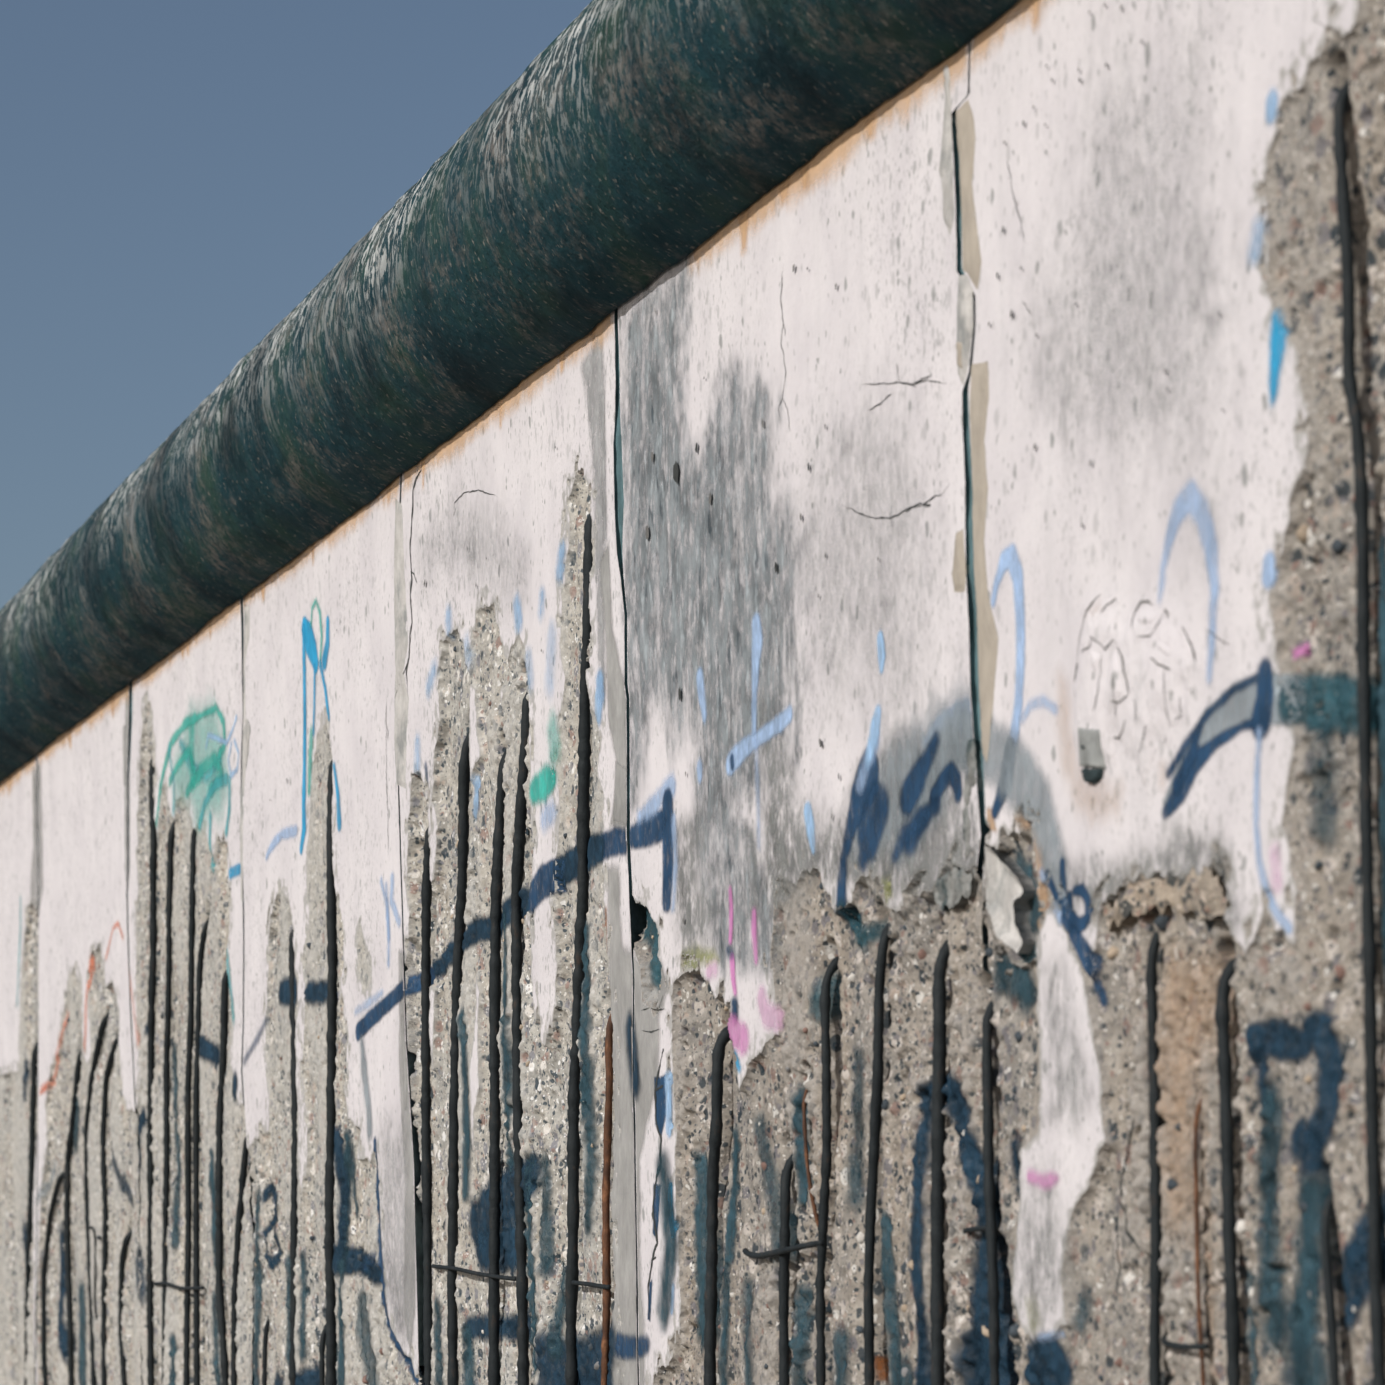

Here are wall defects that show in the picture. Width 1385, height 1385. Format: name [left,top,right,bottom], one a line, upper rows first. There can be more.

crack [846,486,948,520]
crack [863,364,941,410]
spalling [1255,0,1385,685]
spalling [0,455,1385,1385]